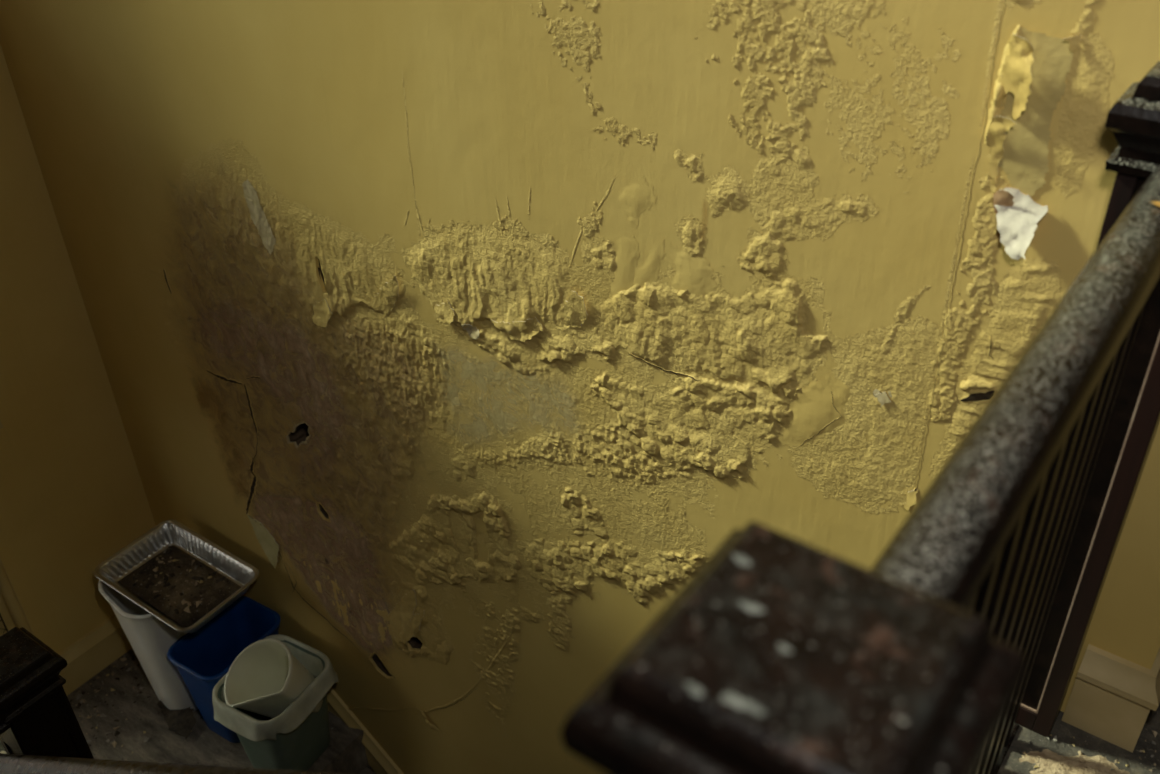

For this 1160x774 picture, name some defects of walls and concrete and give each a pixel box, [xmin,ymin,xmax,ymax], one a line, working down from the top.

peeling [530,0,657,151]
peeling [694,0,879,243]
peeling [674,214,707,257]
peeling [787,0,1101,515]
crack [207,369,262,526]